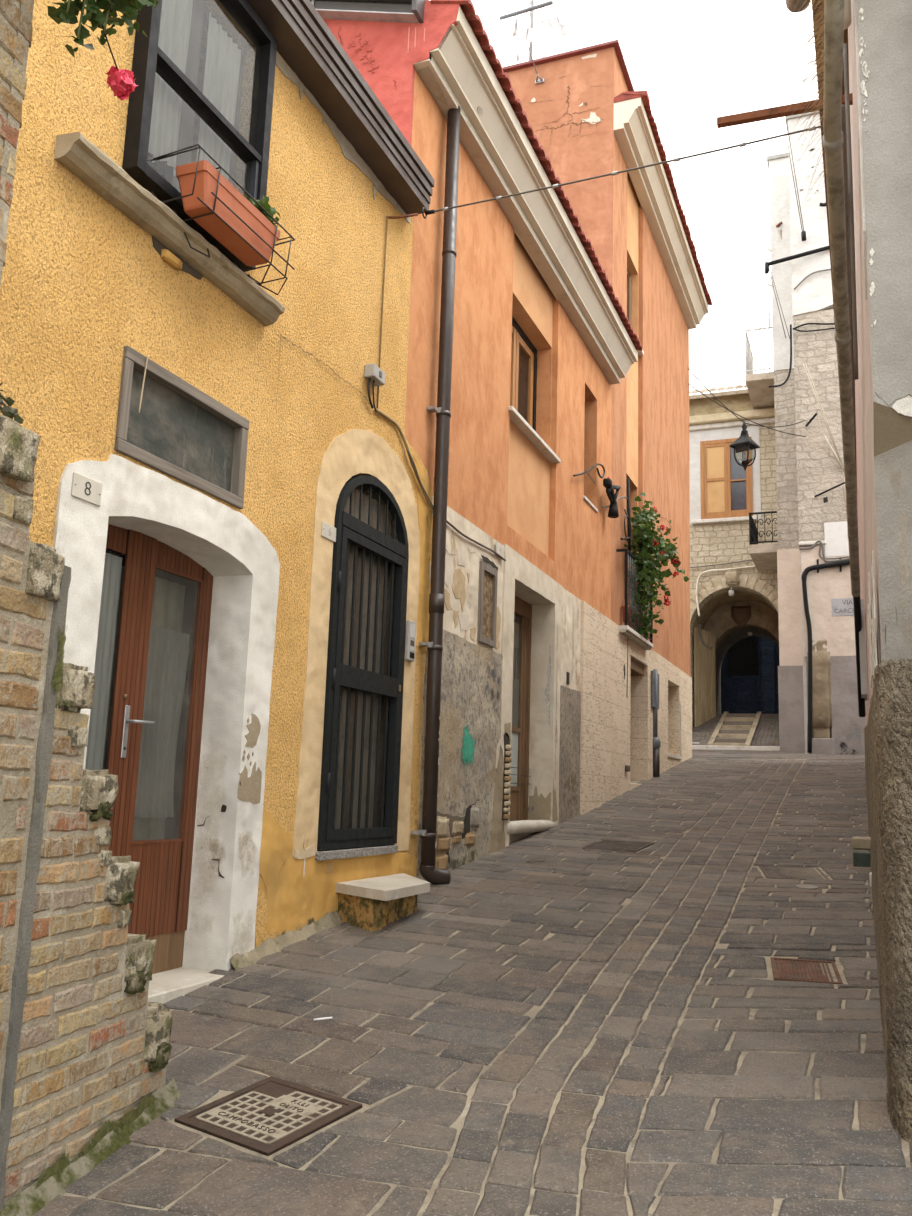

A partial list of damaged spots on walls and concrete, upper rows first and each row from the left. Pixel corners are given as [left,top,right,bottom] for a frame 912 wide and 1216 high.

crack [529,76,607,142]
spalling [890,394,912,419]
peeling [197,713,262,826]